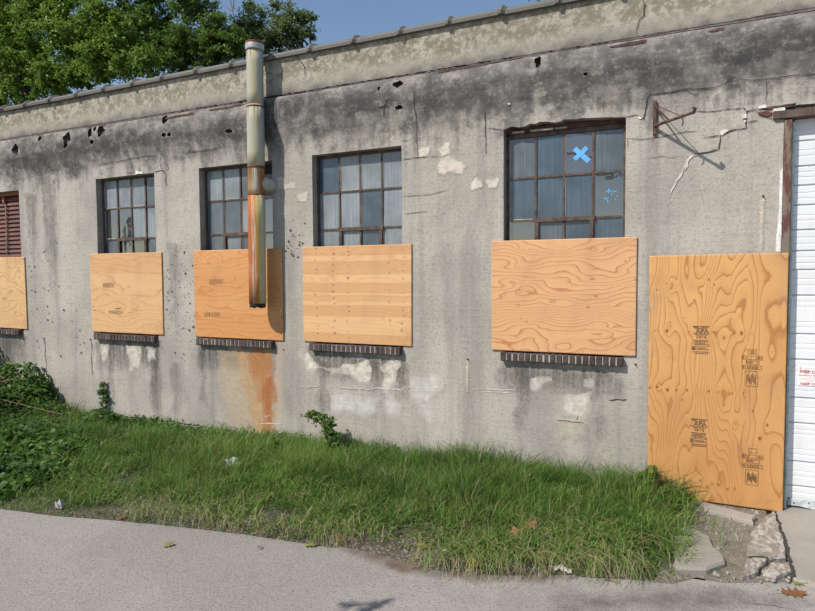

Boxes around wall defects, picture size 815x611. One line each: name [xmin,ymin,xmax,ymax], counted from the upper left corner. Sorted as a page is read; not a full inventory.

crack [0,0,815,160]
leakage [312,13,815,137]
spalling [88,126,105,144]
crack [96,155,168,186]
flaking render [161,112,193,137]
peeling [418,141,467,177]
peeling [469,177,500,192]
crack [627,74,814,194]
corrosion [216,340,289,436]
leakage [295,342,447,430]
leakage [489,353,632,452]